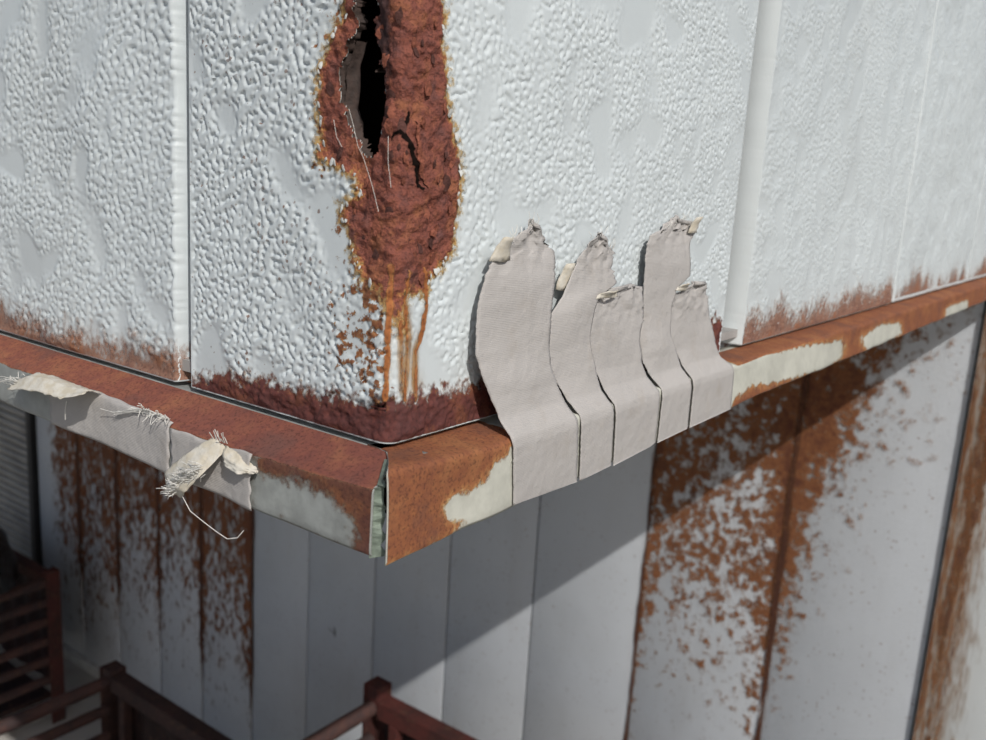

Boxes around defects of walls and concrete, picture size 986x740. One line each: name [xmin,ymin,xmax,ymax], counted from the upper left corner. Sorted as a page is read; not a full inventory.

peeling [7,372,101,400]
corrosion [48,424,254,706]
peeling [165,438,258,498]
corrosion [0,0,513,565]
corrosion [624,258,986,740]